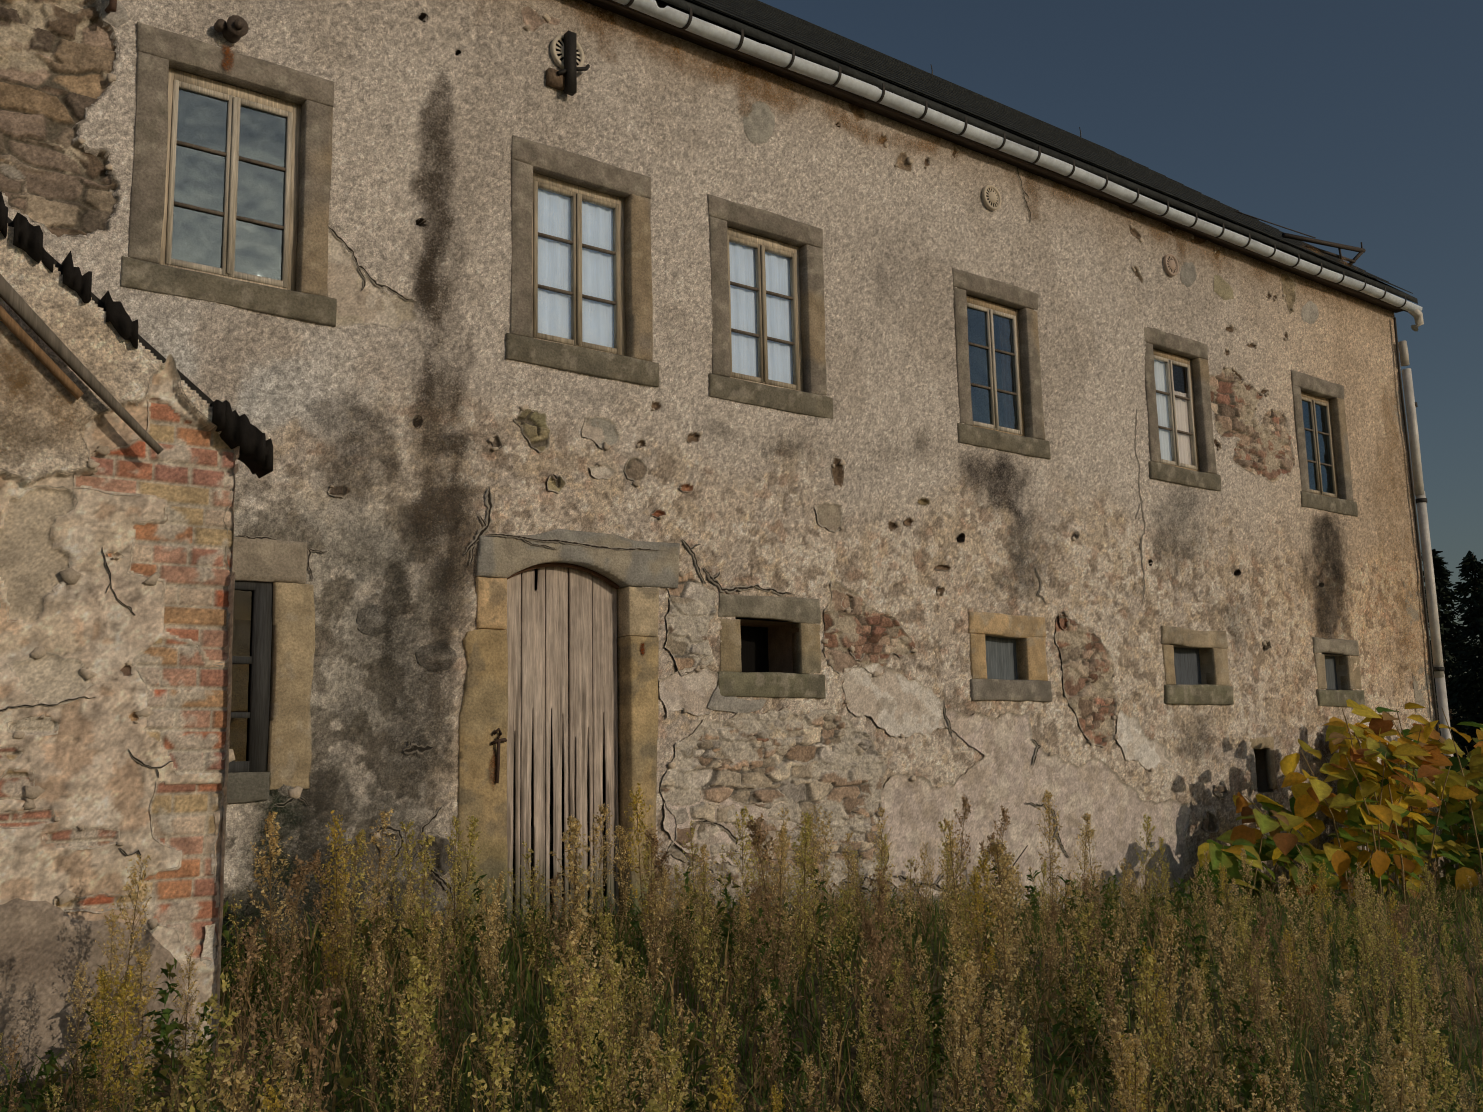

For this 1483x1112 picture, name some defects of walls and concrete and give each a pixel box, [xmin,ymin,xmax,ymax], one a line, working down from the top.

flaking render [0,0,120,238]
crack [328,226,418,302]
flaking render [1209,324,1295,483]
crack [101,547,135,615]
damp [297,81,478,914]
damp [966,457,1034,594]
damp [1304,518,1348,640]
crack [0,696,94,712]
flaking render [0,354,239,1058]
flaking render [288,786,303,799]
flaking render [659,569,1228,912]